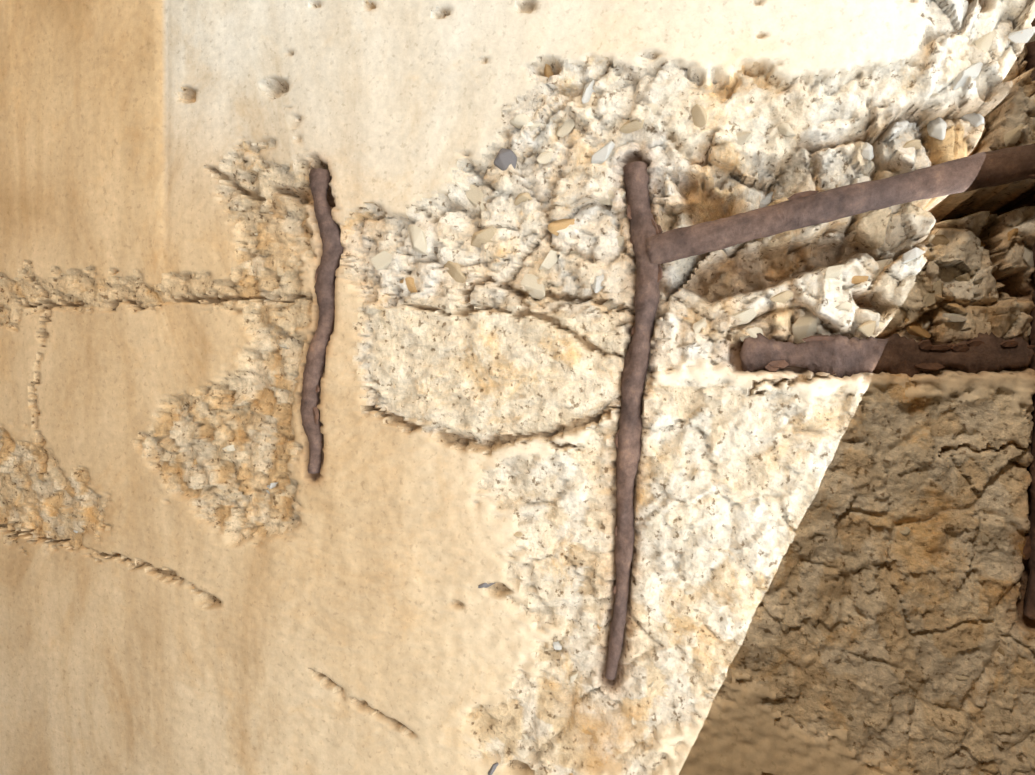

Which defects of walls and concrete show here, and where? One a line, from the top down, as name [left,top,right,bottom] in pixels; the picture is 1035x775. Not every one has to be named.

spalling [0,427,111,556]
spalling [134,139,344,543]
spalling [340,0,1035,775]